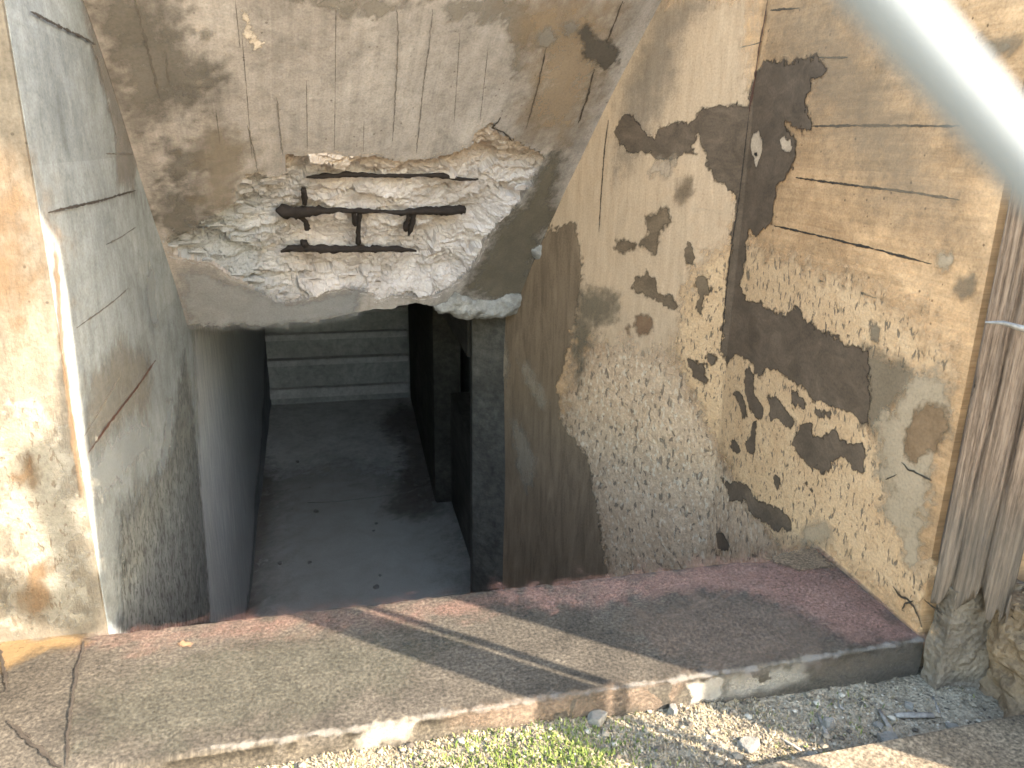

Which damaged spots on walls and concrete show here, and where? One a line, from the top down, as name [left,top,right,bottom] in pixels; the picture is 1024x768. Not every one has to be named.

crack [31,11,118,142]
leakage [82,0,228,189]
crack [275,97,283,153]
crack [392,9,433,153]
crack [491,47,547,141]
crack [48,190,136,213]
leakage [151,148,212,236]
spalling [163,118,550,304]
rust [275,171,478,254]
peeling [613,53,959,634]
crack [0,650,9,691]
crack [7,641,85,768]